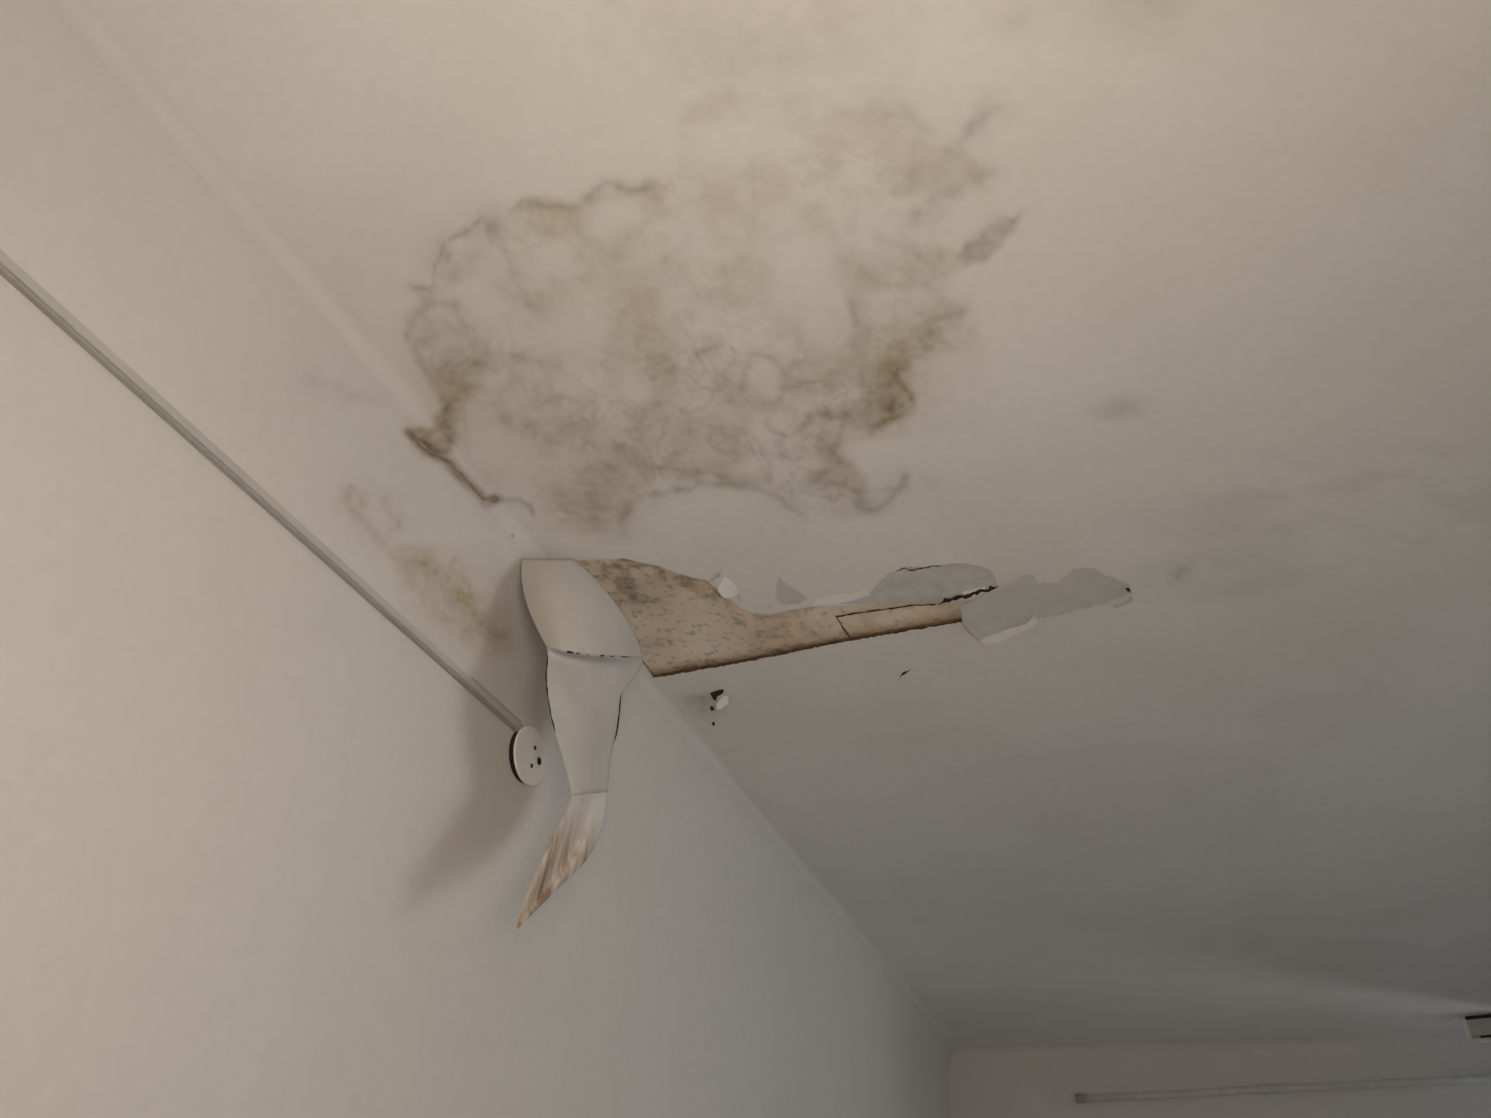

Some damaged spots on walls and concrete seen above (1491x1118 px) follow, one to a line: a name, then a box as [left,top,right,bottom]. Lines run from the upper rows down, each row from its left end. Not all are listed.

peeling [517,559,999,929]
peeling [1032,567,1134,619]